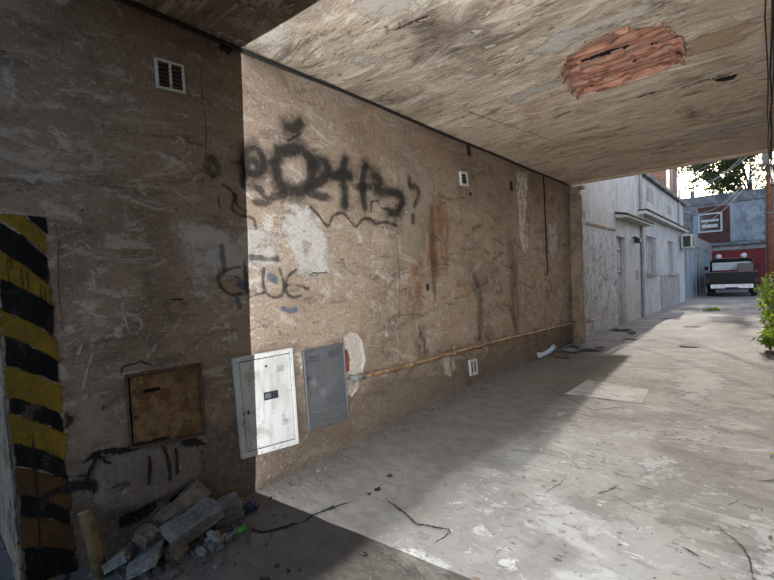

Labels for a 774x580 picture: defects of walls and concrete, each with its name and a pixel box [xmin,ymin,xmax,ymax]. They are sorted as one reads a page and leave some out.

spalling [506,0,762,104]
crack [636,62,750,100]
spalling [343,332,392,397]
crack [251,502,349,533]
crack [388,500,451,542]